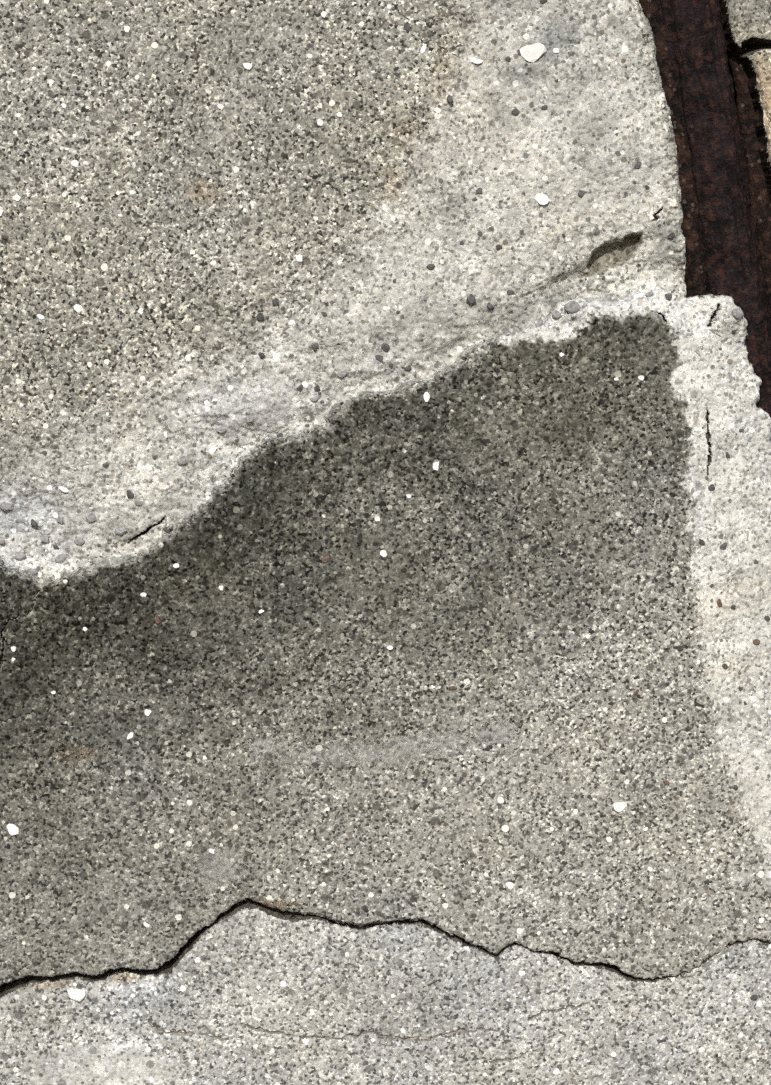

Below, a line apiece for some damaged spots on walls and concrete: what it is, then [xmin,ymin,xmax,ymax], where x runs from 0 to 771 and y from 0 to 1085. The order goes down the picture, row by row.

water stain [0,317,676,736]
crack [0,898,691,998]
crack [726,938,771,948]